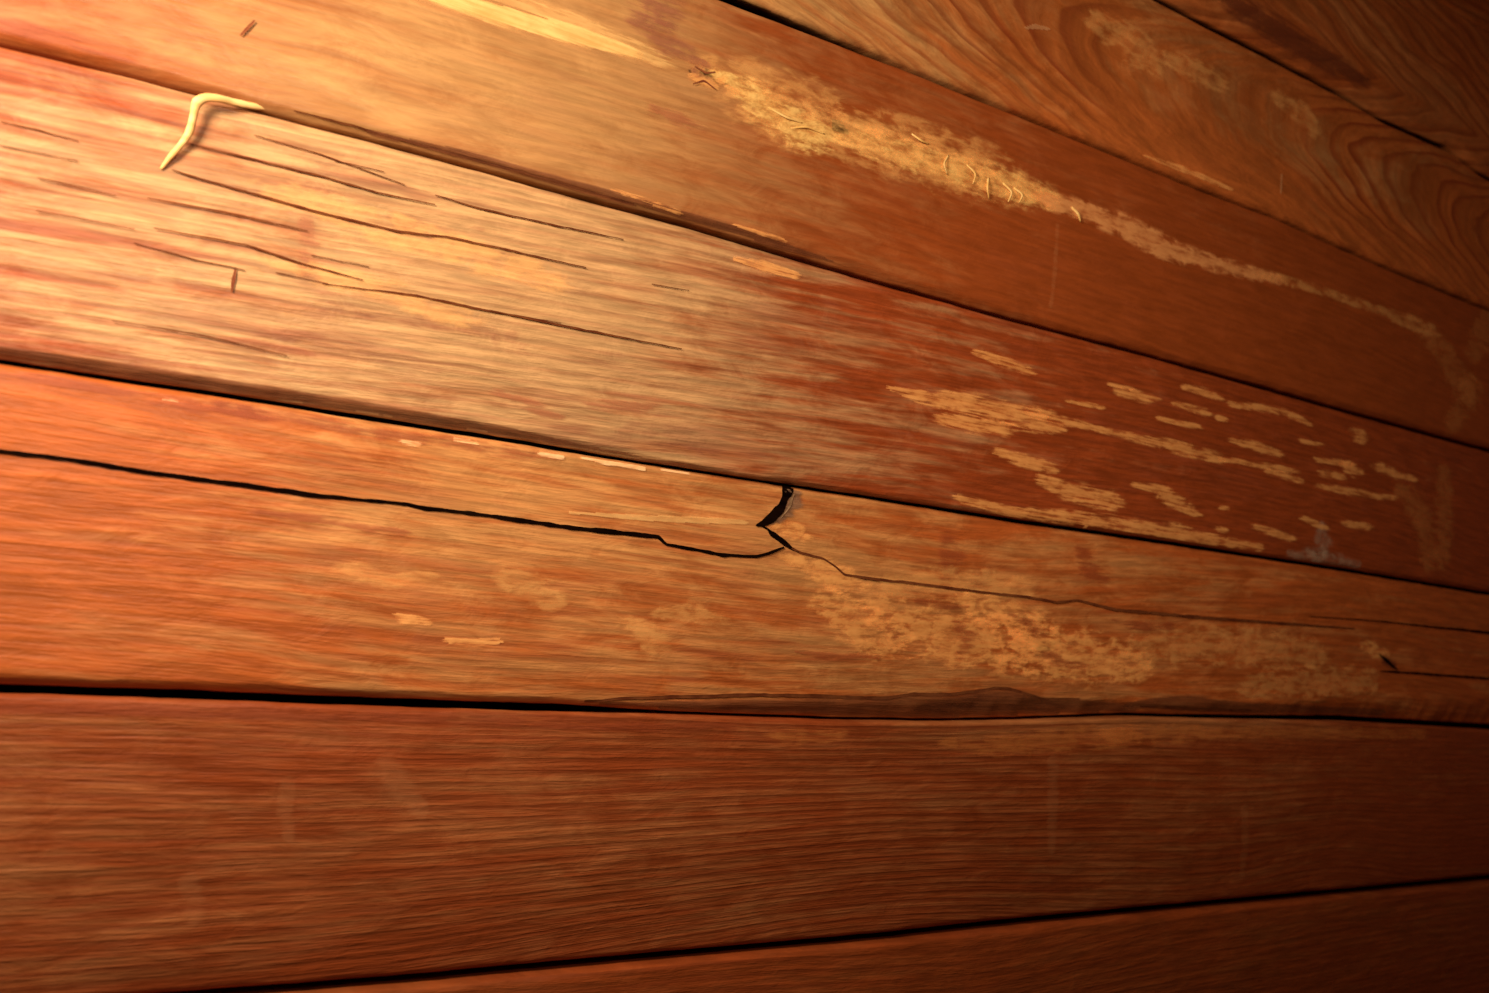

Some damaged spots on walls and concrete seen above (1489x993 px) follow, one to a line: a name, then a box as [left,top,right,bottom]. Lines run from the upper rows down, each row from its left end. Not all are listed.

crack [0,449,1489,634]
crack [1380,671,1489,679]